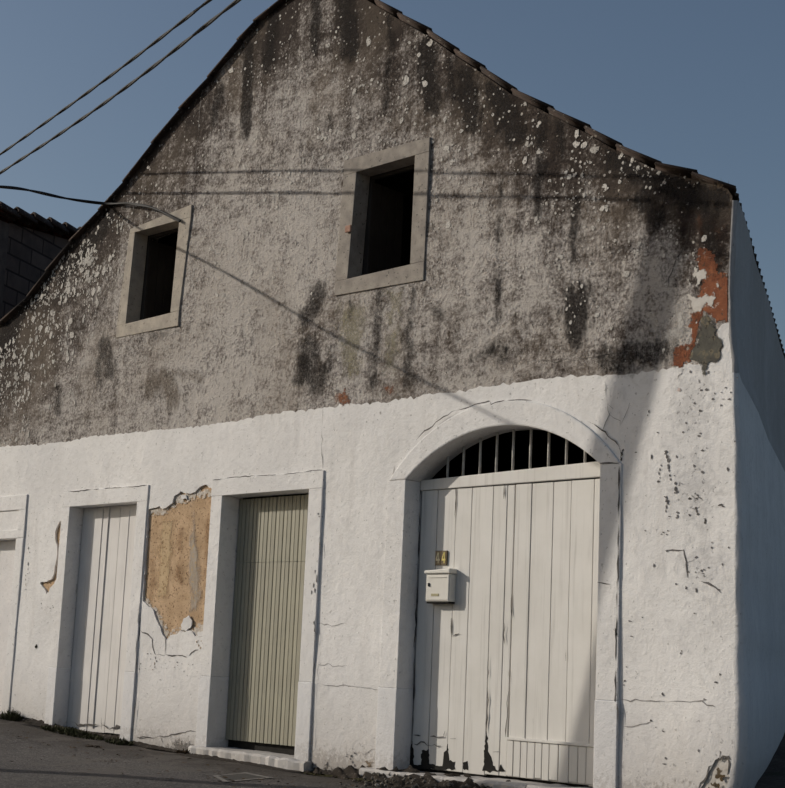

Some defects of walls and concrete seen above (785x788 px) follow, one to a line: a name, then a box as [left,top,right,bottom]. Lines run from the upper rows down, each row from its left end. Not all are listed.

leakage [240,41,253,139]
leakage [417,37,547,217]
leakage [605,149,729,268]
leakage [558,281,594,349]
leakage [597,339,676,373]
peeling [662,248,728,373]
crack [406,399,532,451]
peeling [42,562,58,592]
peeling [144,485,212,649]
crack [590,383,721,734]
crack [135,612,196,675]
spalling [702,758,729,788]